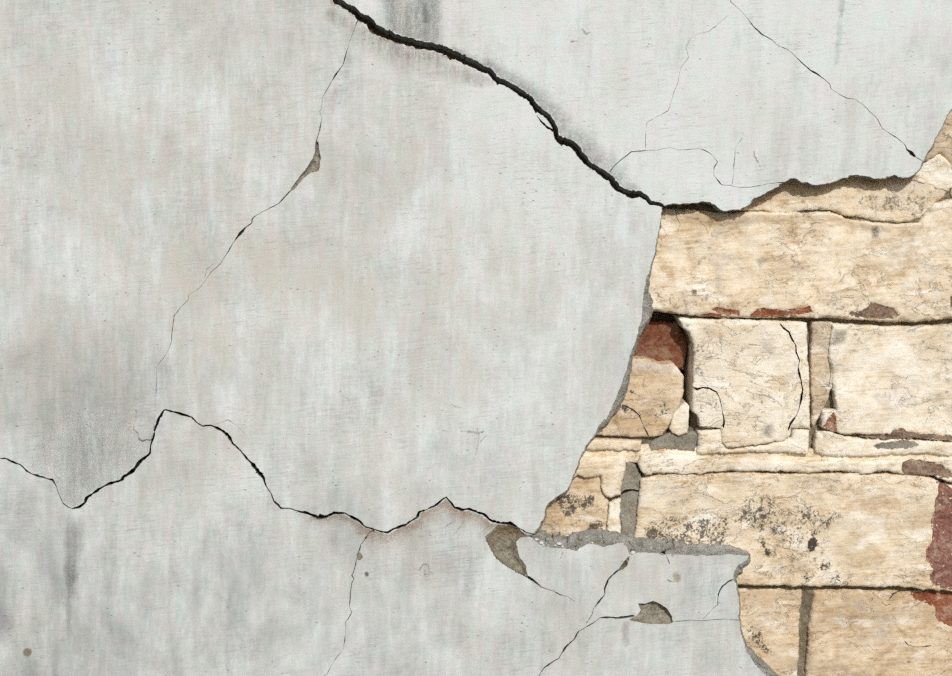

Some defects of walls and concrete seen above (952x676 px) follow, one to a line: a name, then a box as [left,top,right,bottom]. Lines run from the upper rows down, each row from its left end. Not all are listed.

crack [316,0,922,227]
crack [0,191,531,676]
crack [693,387,725,430]
spalling [485,109,952,676]
crack [780,324,831,430]
crack [528,569,635,676]
crack [673,579,733,622]